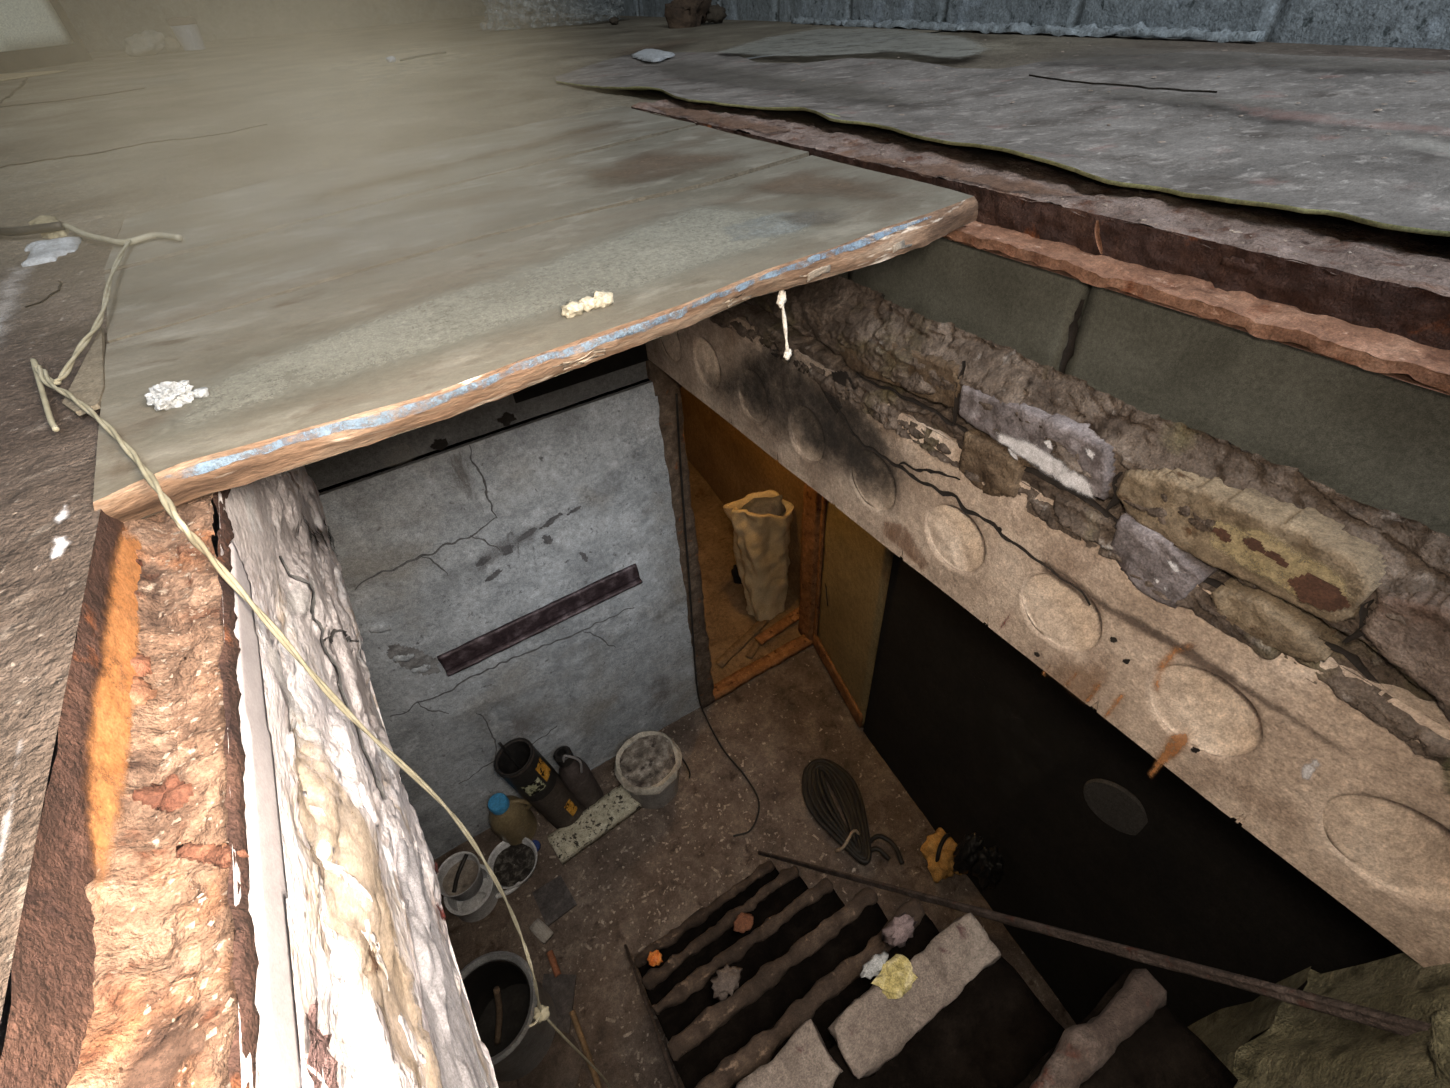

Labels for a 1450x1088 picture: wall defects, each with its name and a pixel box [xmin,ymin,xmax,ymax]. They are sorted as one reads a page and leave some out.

crack [0,77,146,107]
crack [0,124,267,168]
crack [1029,74,1217,93]
crack [355,445,500,590]
crack [279,555,634,800]
peeling [287,721,442,1088]